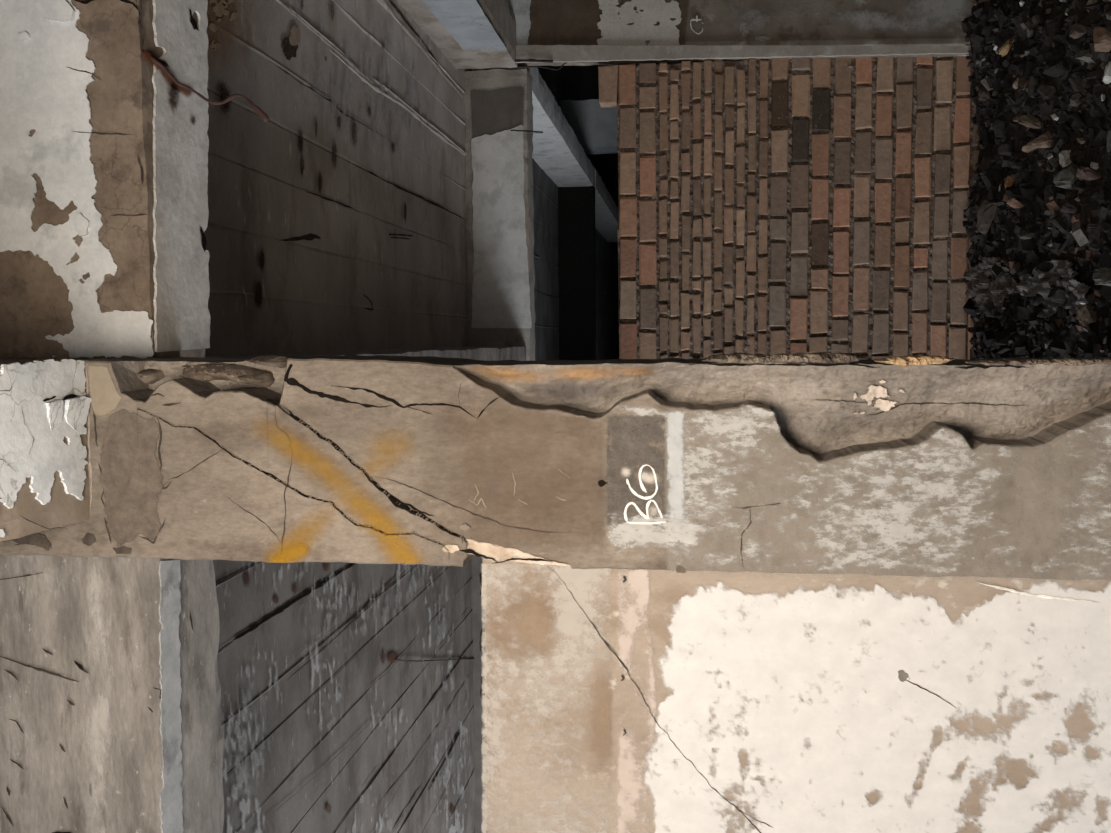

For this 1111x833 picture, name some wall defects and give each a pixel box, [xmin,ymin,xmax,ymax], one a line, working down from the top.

corrosion [142,50,270,123]
peeling [597,0,682,46]
peeling [0,0,355,554]
peeling [471,125,532,328]
crack [138,364,565,680]
crack [257,573,486,832]
crack [549,567,773,833]
peeling [442,352,1111,833]